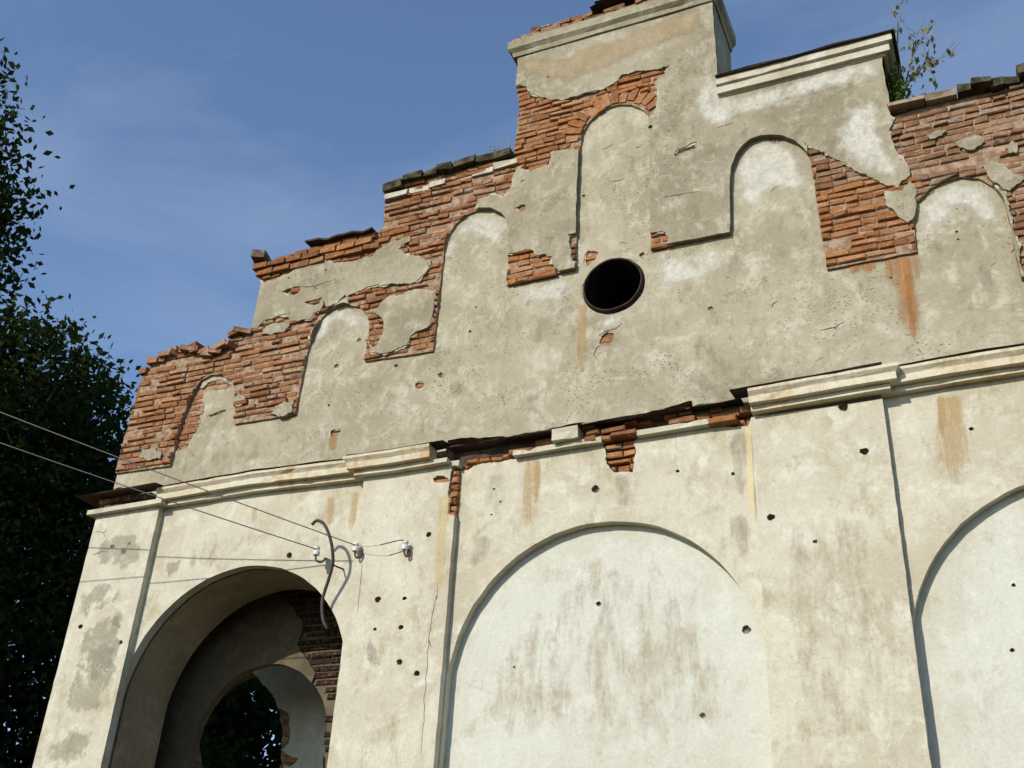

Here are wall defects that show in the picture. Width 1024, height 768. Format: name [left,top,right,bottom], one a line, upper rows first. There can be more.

flaking render [807,82,1024,271]
flaking render [253,254,300,294]
flaking render [325,71,665,367]
flaking render [640,233,674,259]
corrosion [887,255,918,336]
flaking render [115,298,332,472]
flaking render [664,406,753,428]
flaking render [435,471,461,518]
flaking render [279,590,343,700]
flaking render [277,707,298,768]
flaking render [324,716,333,752]